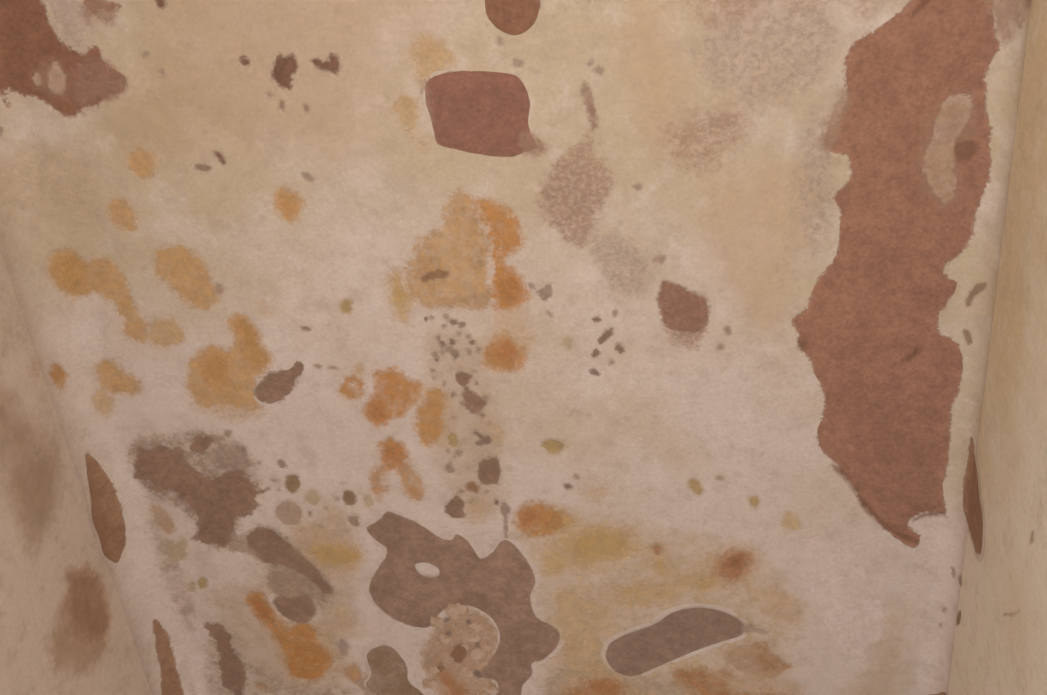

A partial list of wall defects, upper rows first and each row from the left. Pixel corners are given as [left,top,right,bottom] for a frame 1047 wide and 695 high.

peeling [0,0,127,117]
peeling [477,0,548,44]
peeling [417,60,545,164]
peeling [656,280,711,347]
peeling [784,0,1030,562]
damp [152,505,187,561]
peeling [80,431,565,695]
corrosion [516,504,575,536]
corrosion [246,593,362,684]
peeling [600,603,768,680]